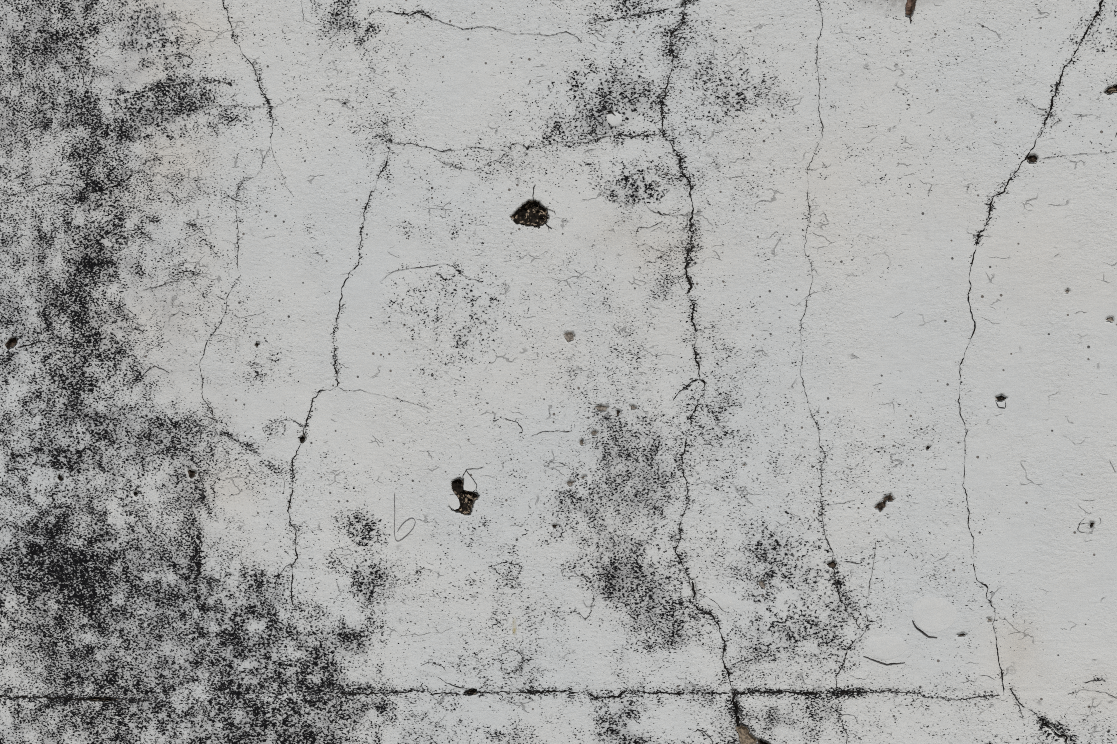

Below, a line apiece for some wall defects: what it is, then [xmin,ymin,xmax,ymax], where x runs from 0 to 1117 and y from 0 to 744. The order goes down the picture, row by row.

leakage [1070,0,1117,57]
crack [109,3,285,420]
spalling [510,184,555,229]
leakage [0,0,397,744]
spalling [447,467,482,515]
leakage [539,411,695,650]
crack [262,0,1115,744]
spalling [736,725,757,744]